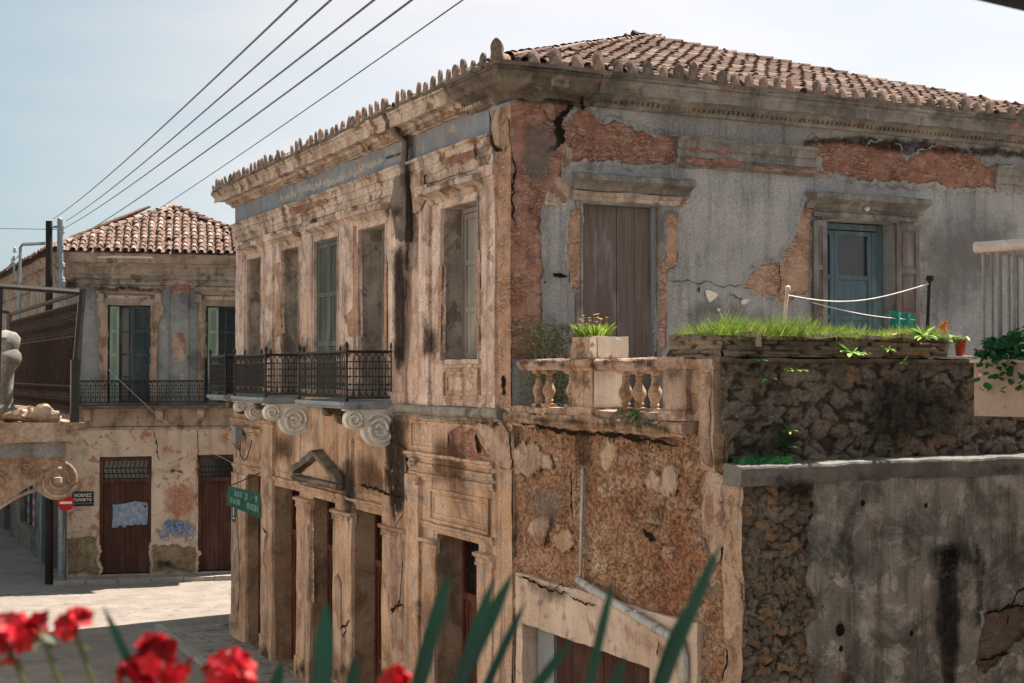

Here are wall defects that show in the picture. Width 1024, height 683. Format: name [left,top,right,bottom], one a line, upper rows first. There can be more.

crack [488,109,517,227]
flaking render [798,131,1024,199]
flaking render [445,63,680,479]
crack [668,279,743,300]
flaking render [740,194,816,314]
flaking render [63,533,103,576]
flaking render [149,542,201,574]
crack [519,576,596,607]
leakage [930,543,986,683]
flaking render [969,599,1024,681]